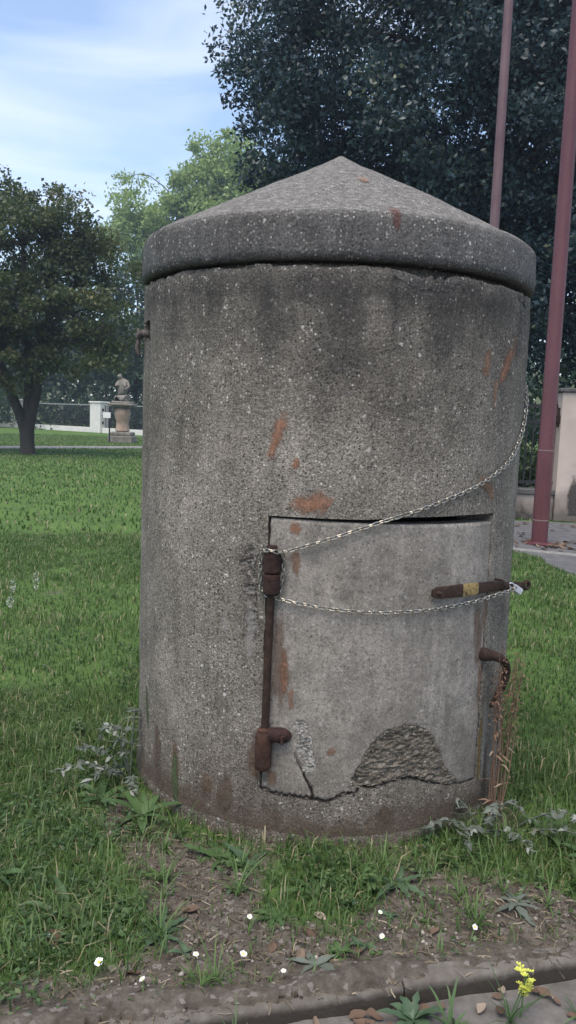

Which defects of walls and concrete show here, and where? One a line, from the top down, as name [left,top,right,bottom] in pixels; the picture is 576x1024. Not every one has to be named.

spalling [290,720,316,773]
crack [254,757,439,803]
spalling [349,724,457,789]